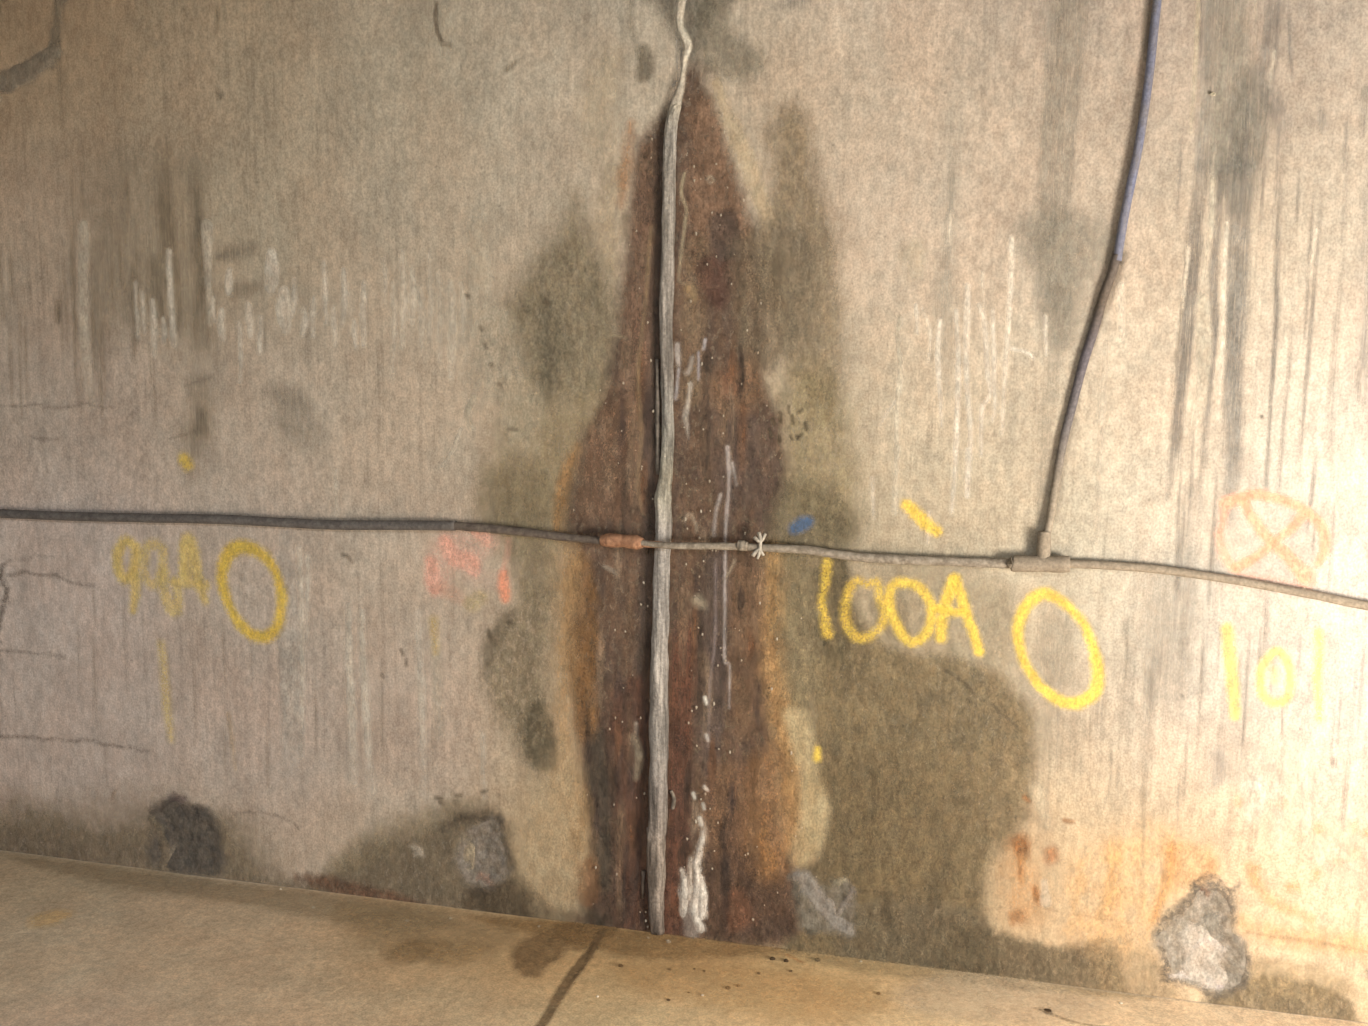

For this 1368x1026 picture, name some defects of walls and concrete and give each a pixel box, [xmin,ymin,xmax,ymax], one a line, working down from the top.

leakage [637,45,653,82]
leakage [649,0,765,80]
leakage [883,0,1116,512]
leakage [1169,0,1291,505]
leakage [1309,229,1318,353]
leakage [0,105,1177,999]
corrosion [522,63,829,945]
leakage [1213,671,1358,882]
spalling [1152,874,1251,999]